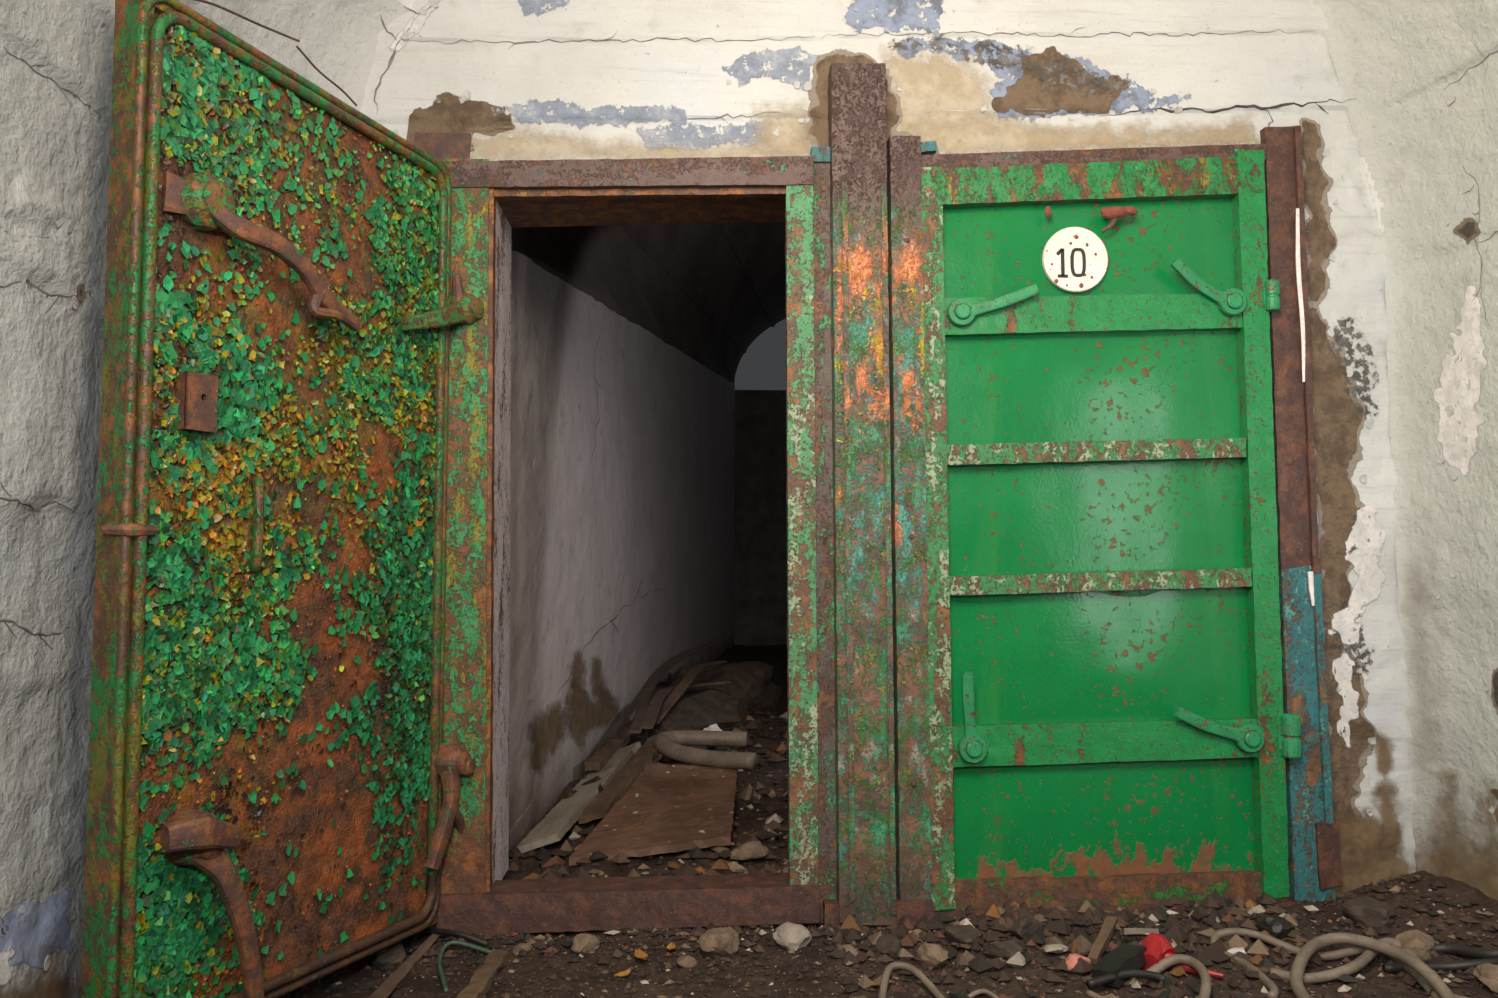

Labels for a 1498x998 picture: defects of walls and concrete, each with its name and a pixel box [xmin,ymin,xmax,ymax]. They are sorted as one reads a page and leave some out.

flaking render [722,46,912,147]
peeling [844,0,1191,123]
crack [1463,167,1498,326]
peeling [133,25,779,998]
spalling [1299,118,1386,824]
water stain [530,653,618,771]
rust [1315,817,1342,890]
water stain [1333,736,1498,901]
peeling [0,889,73,985]